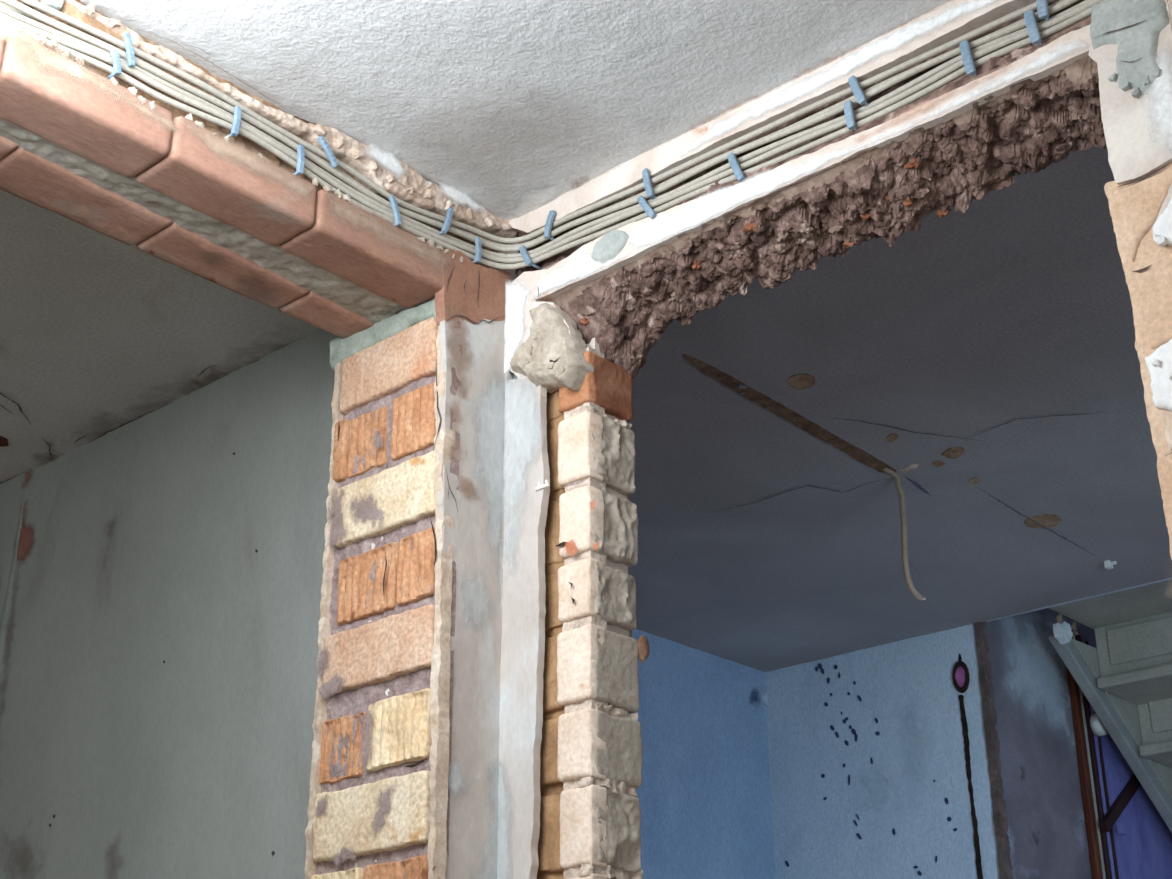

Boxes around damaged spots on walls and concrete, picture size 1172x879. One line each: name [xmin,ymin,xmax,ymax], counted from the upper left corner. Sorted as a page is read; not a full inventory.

peeling [1108,68,1160,99]
flaking render [16,0,1085,278]
flaking render [1104,161,1172,560]
crack [0,360,258,459]
crack [835,412,1101,442]
crack [708,478,888,513]
crack [980,489,1099,558]